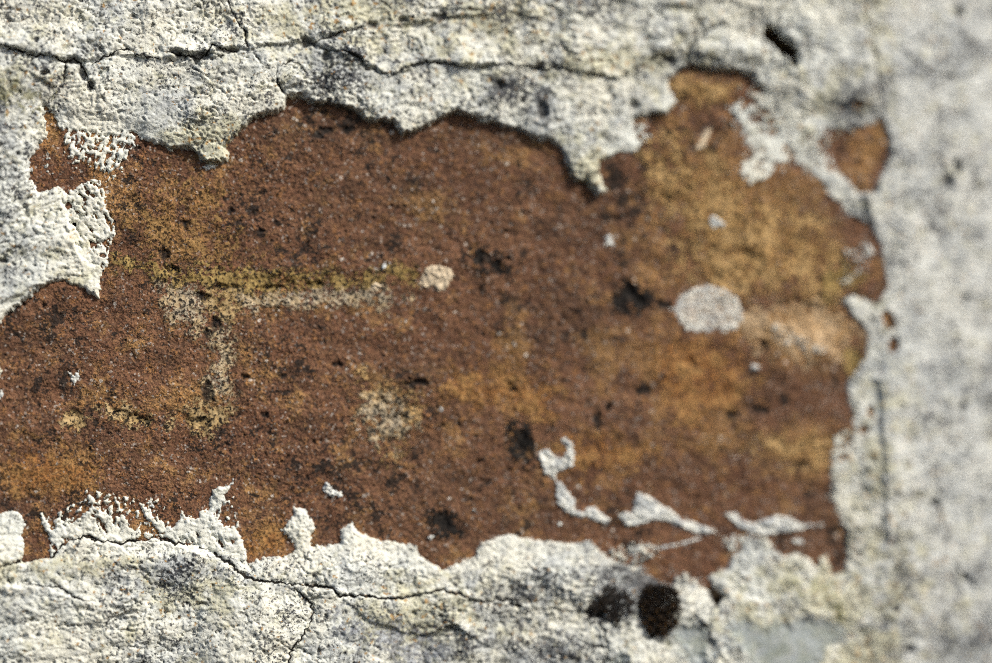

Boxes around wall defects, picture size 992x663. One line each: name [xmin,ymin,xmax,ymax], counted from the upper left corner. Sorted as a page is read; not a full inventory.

crack [0,0,760,104]
spalling [0,65,899,590]
crack [0,535,609,663]
crack [681,609,726,663]